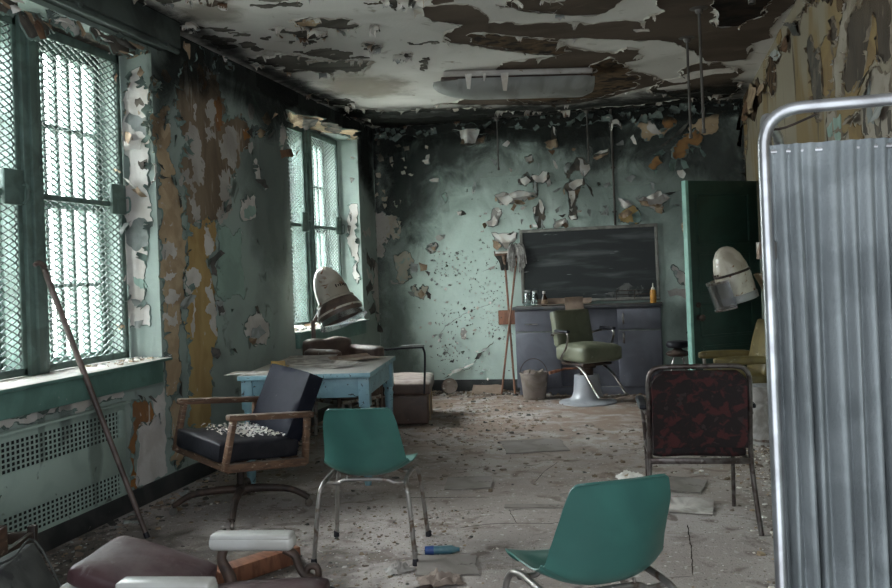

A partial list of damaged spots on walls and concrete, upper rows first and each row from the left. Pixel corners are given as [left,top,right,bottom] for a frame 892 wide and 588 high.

peeling [0,0,437,471]
leakage [137,0,749,242]
flaking render [345,0,892,380]